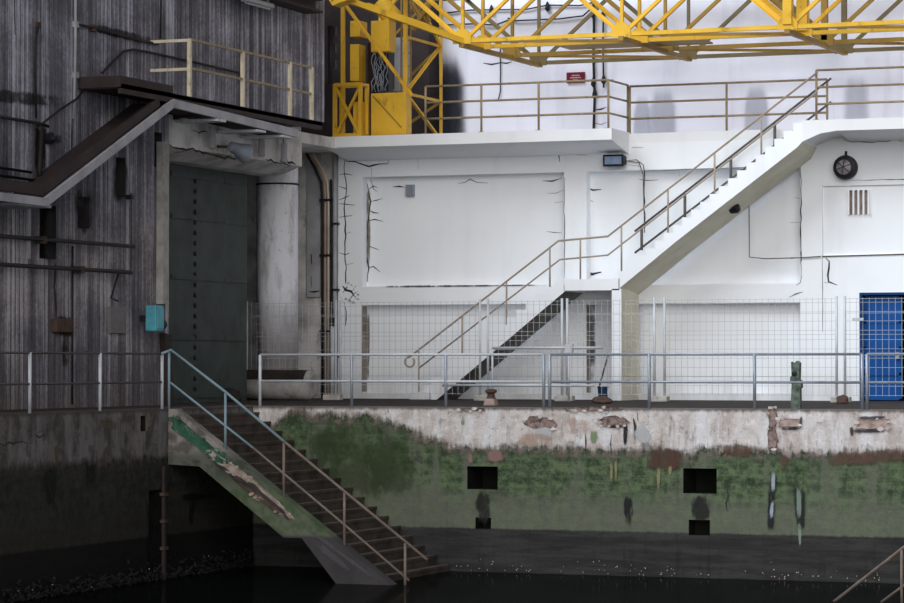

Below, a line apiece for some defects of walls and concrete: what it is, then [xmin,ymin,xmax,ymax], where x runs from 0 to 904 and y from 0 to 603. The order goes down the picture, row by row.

crack [339,160,403,326]
spalling [522,414,557,431]
spalling [564,406,630,428]
leakage [610,425,651,445]
spalling [765,406,780,451]
peeling [168,415,295,520]
corrosion [648,446,682,488]
corrosion [724,445,750,457]
corrosion [828,450,904,465]
leakage [476,493,489,521]
leakage [624,498,633,522]